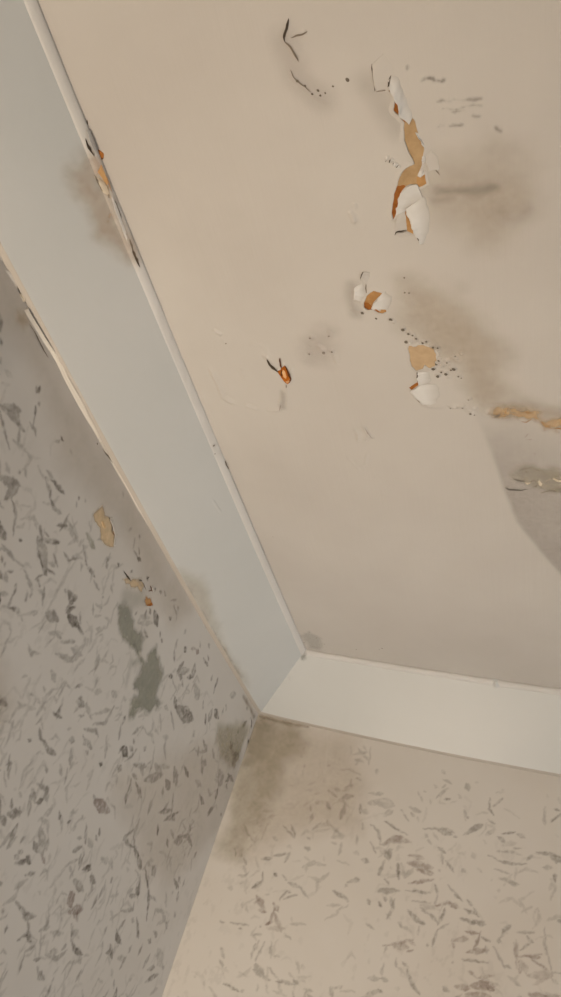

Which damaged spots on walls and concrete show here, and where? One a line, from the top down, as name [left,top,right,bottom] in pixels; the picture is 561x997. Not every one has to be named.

peeling [371,53,440,245]
peeling [346,272,465,410]
water stain [493,406,561,440]